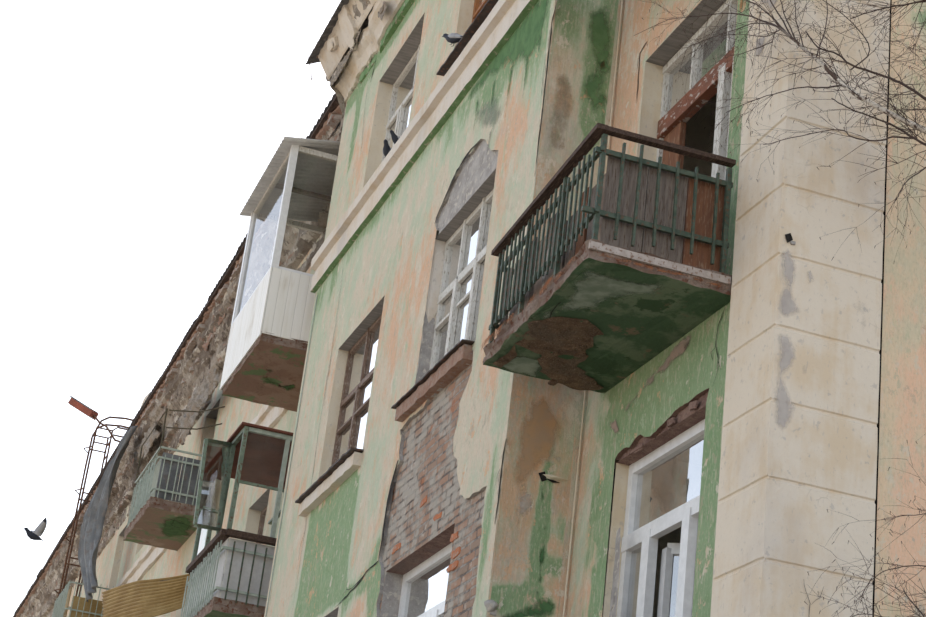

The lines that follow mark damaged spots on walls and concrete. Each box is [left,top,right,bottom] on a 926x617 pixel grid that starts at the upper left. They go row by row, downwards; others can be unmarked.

peeling [326,0,387,87]
damp [470,0,547,139]
spalling [493,272,657,390]
spalling [133,423,161,463]
spalling [177,367,223,445]
crack [339,460,398,604]
peeling [446,531,461,573]